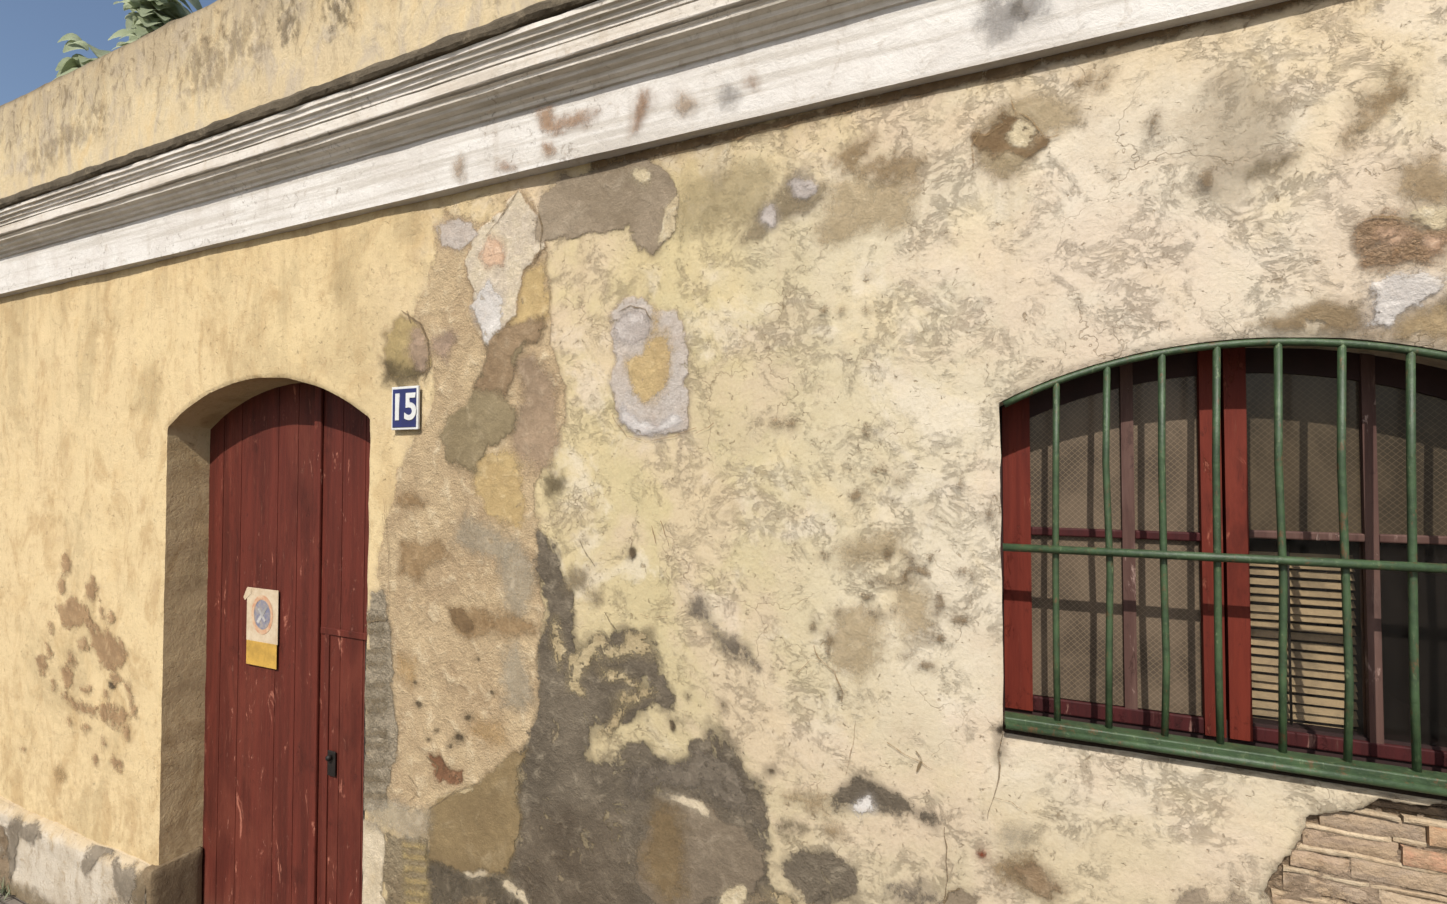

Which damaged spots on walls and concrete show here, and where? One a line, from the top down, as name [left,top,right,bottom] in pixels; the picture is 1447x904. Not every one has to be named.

flaking render [970,95,1077,178]
peeling [658,195,679,243]
flaking render [1351,154,1447,329]
peeling [609,296,714,440]
peeling [362,211,566,904]
peeling [36,553,137,774]
peeling [688,595,761,671]
peeling [670,795,710,818]
flaking render [788,775,939,835]
peeling [719,885,747,904]
peeling [1177,888,1249,904]
flaking render [1264,805,1447,904]